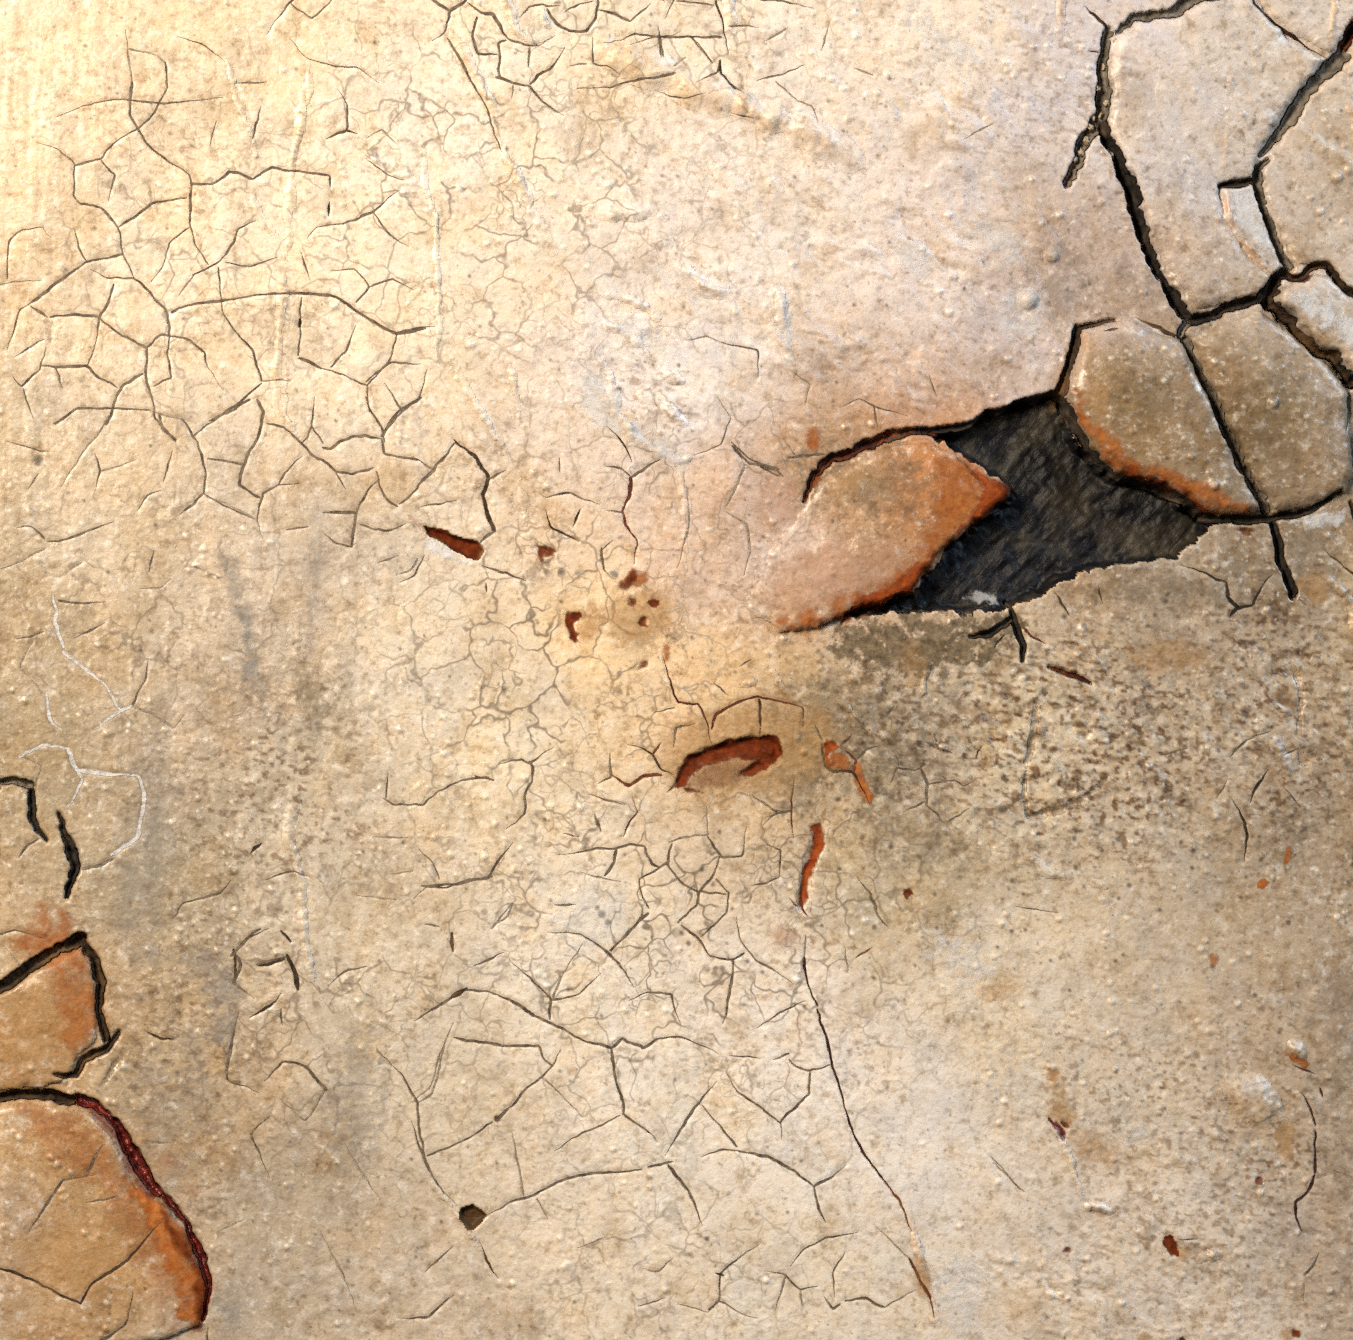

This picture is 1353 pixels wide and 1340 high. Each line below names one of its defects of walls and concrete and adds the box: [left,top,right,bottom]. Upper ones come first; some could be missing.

crack [0,0,526,898]
spalling [423,525,484,560]
rust [538,546,555,561]
rust [565,611,598,642]
crack [540,426,658,579]
rust [611,569,659,627]
spalling [746,397,1219,632]
spalling [738,731,781,778]
rust [799,823,825,907]
crack [226,928,366,1178]
crack [352,655,982,1319]
crack [0,929,242,1340]